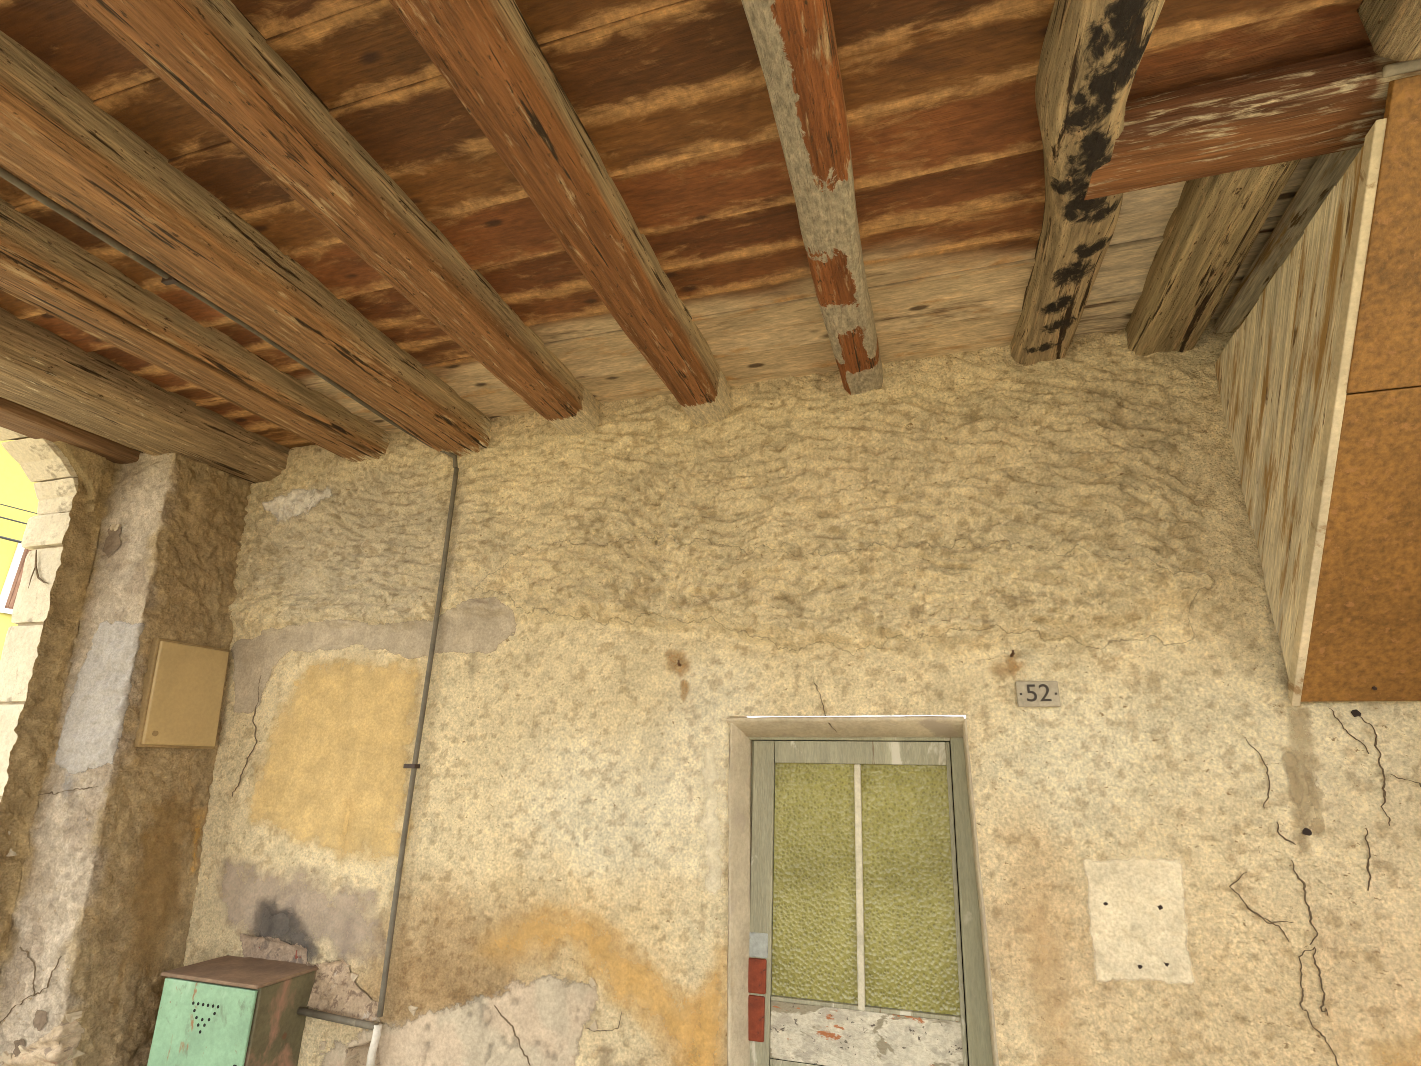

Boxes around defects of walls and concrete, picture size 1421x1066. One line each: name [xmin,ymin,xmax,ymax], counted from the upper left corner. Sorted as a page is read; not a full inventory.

crack [1329,708,1421,891]
damp [222,860,375,953]
crack [1229,739,1339,1066]
spalling [240,933,598,1066]